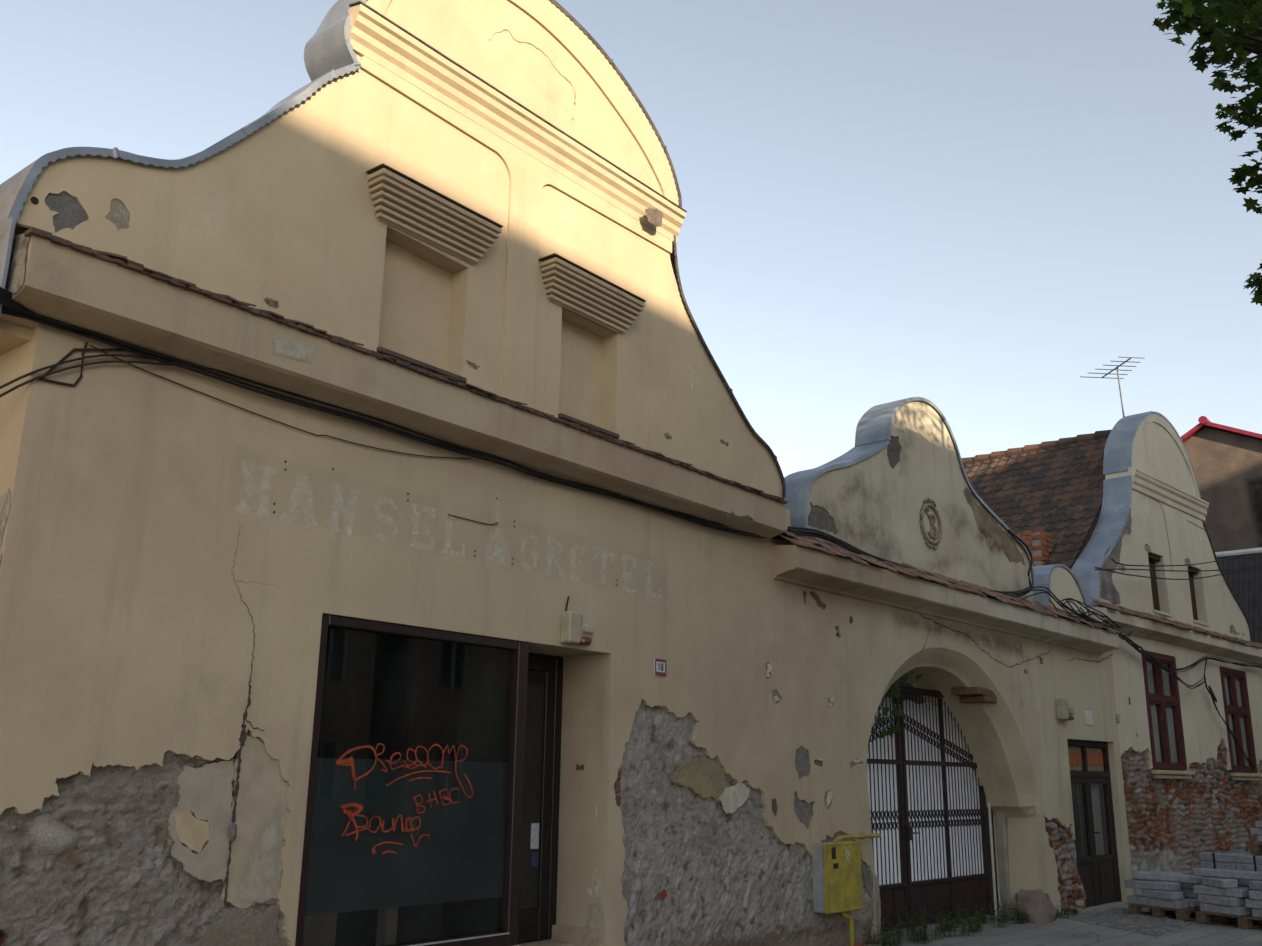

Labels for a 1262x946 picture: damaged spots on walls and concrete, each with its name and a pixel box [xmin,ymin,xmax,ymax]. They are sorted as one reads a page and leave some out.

flaking render [30,191,88,233]
peeling [105,199,129,231]
flaking render [887,436,901,469]
flaking render [807,503,838,535]
crack [224,524,279,906]
peeling [719,782,750,814]
flaking render [794,746,833,829]